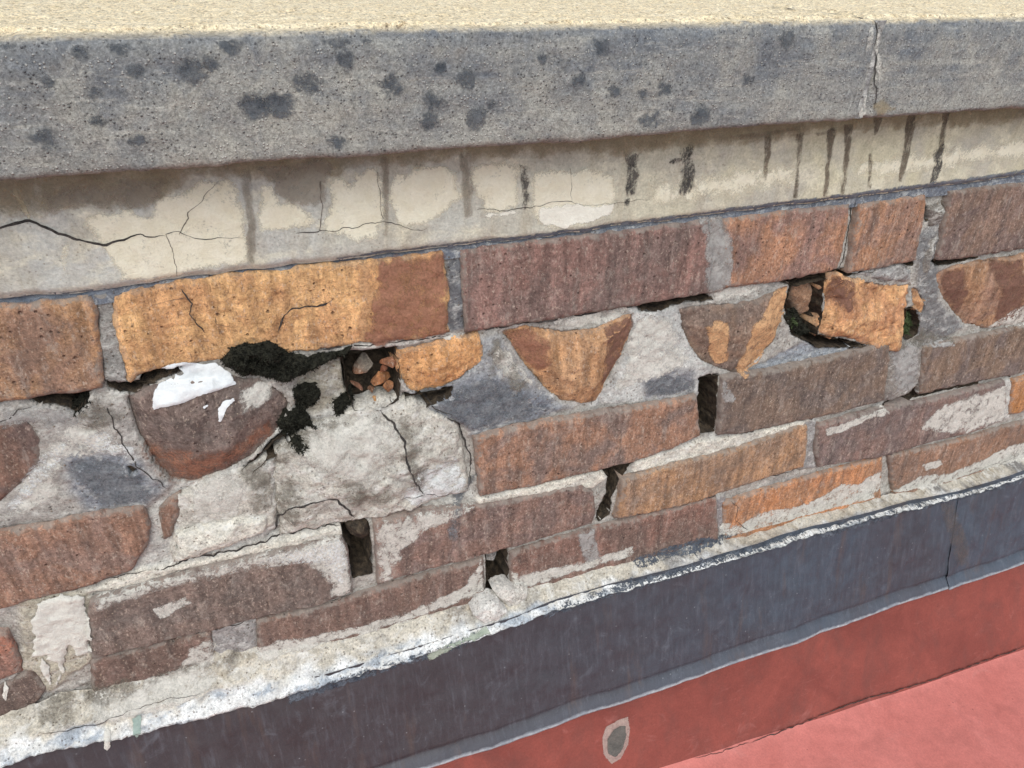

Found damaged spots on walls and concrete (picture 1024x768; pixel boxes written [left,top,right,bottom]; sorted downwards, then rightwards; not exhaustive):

crack [760,5,878,104]
water stain [0,167,194,209]
crack [300,172,425,233]
water stain [218,96,1024,204]
crack [0,185,238,332]
spalling [86,180,483,480]
spalling [502,267,926,433]
crack [107,408,168,489]
crack [380,410,449,500]
peeling [596,462,633,521]
peeling [341,520,373,578]
peeling [485,549,509,589]